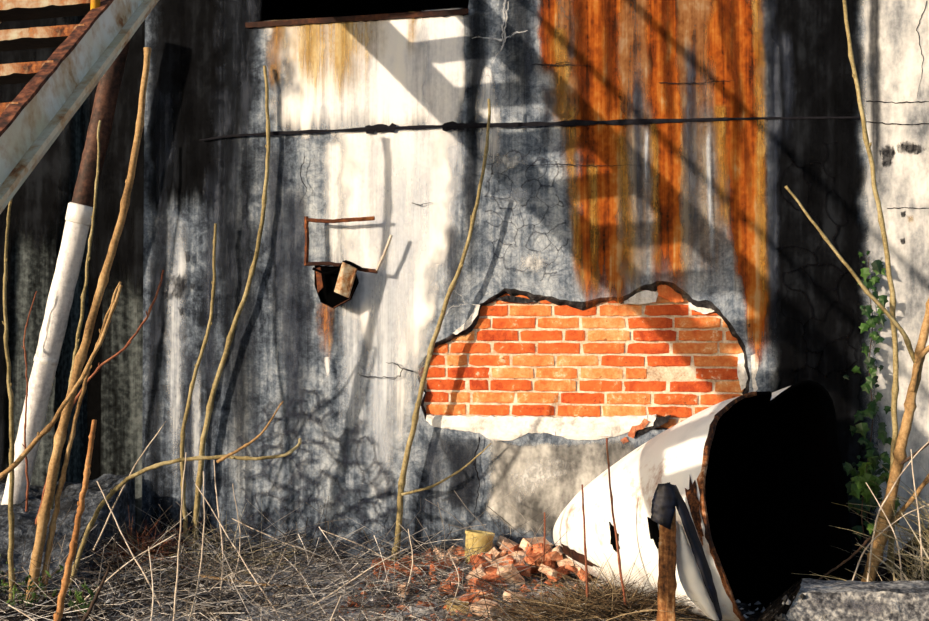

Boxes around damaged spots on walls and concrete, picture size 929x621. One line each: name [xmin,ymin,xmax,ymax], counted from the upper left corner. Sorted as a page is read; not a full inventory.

damp [87,0,257,502]
crack [238,388,406,558]
rust [322,303,331,374]
spalling [316,266,359,309]
damp [269,0,488,458]
crack [359,362,413,380]
crack [199,1,929,281]
spalling [415,281,759,444]
rust [538,0,769,360]
crack [776,141,857,378]
damp [765,0,872,574]